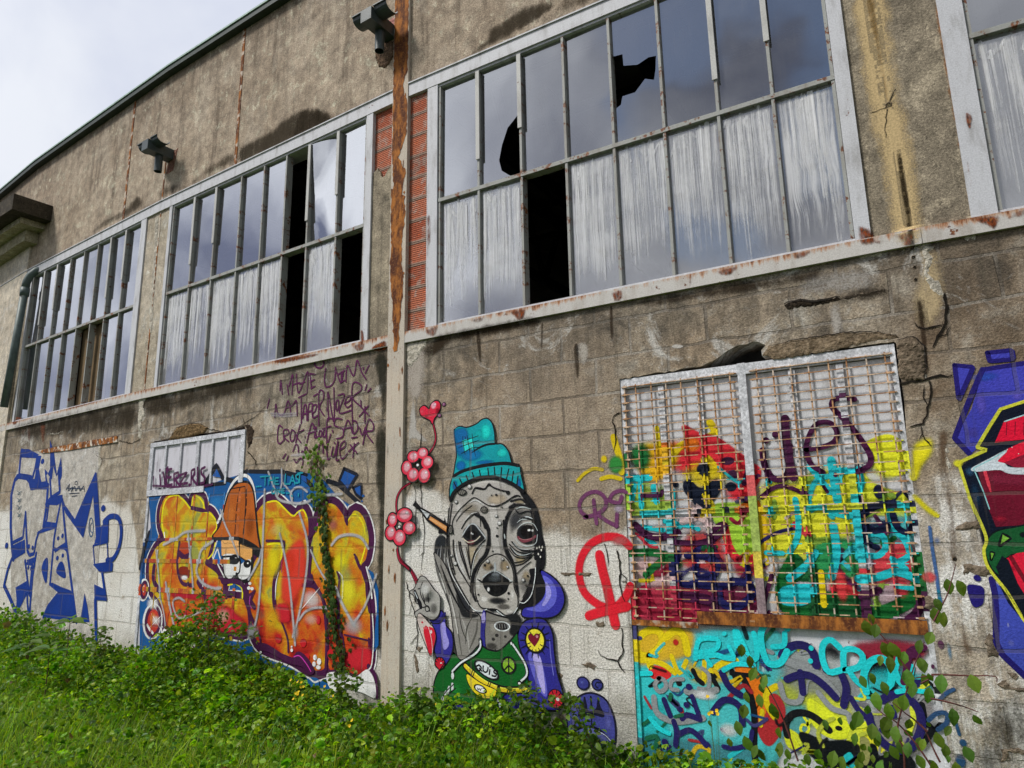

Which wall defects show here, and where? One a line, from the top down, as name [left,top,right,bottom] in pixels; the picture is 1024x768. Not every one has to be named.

rust [355,0,409,352]
rust [977,216,997,228]
rust [859,227,878,243]
spalling [784,289,885,309]
crack [915,291,951,347]
crack [900,374,952,447]
spalling [169,423,208,440]
spalling [245,424,254,448]